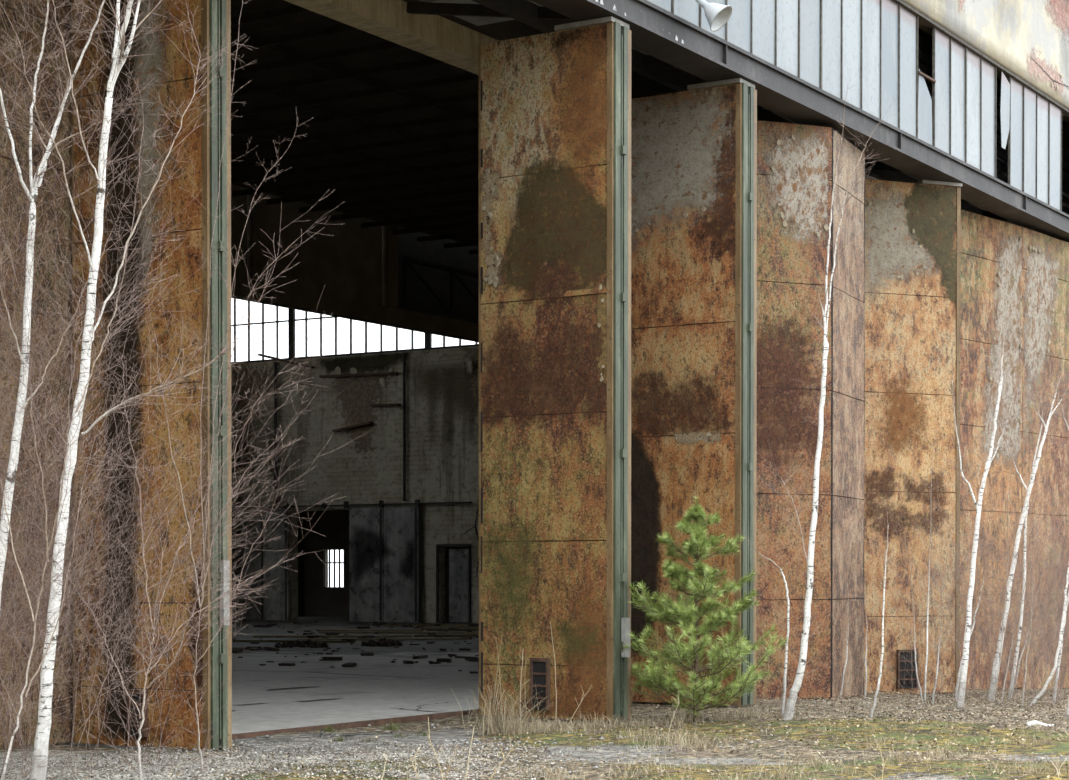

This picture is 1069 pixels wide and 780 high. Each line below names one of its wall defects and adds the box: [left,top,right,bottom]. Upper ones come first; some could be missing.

flaking render [1046,0,1069,34]
flaking render [1026,47,1064,94]
rust [697,85,736,259]
water stain [501,159,607,289]
water stain [904,184,957,304]
rust [632,371,730,436]
rust [757,319,821,480]
rust [881,380,925,451]
rust [865,468,947,536]